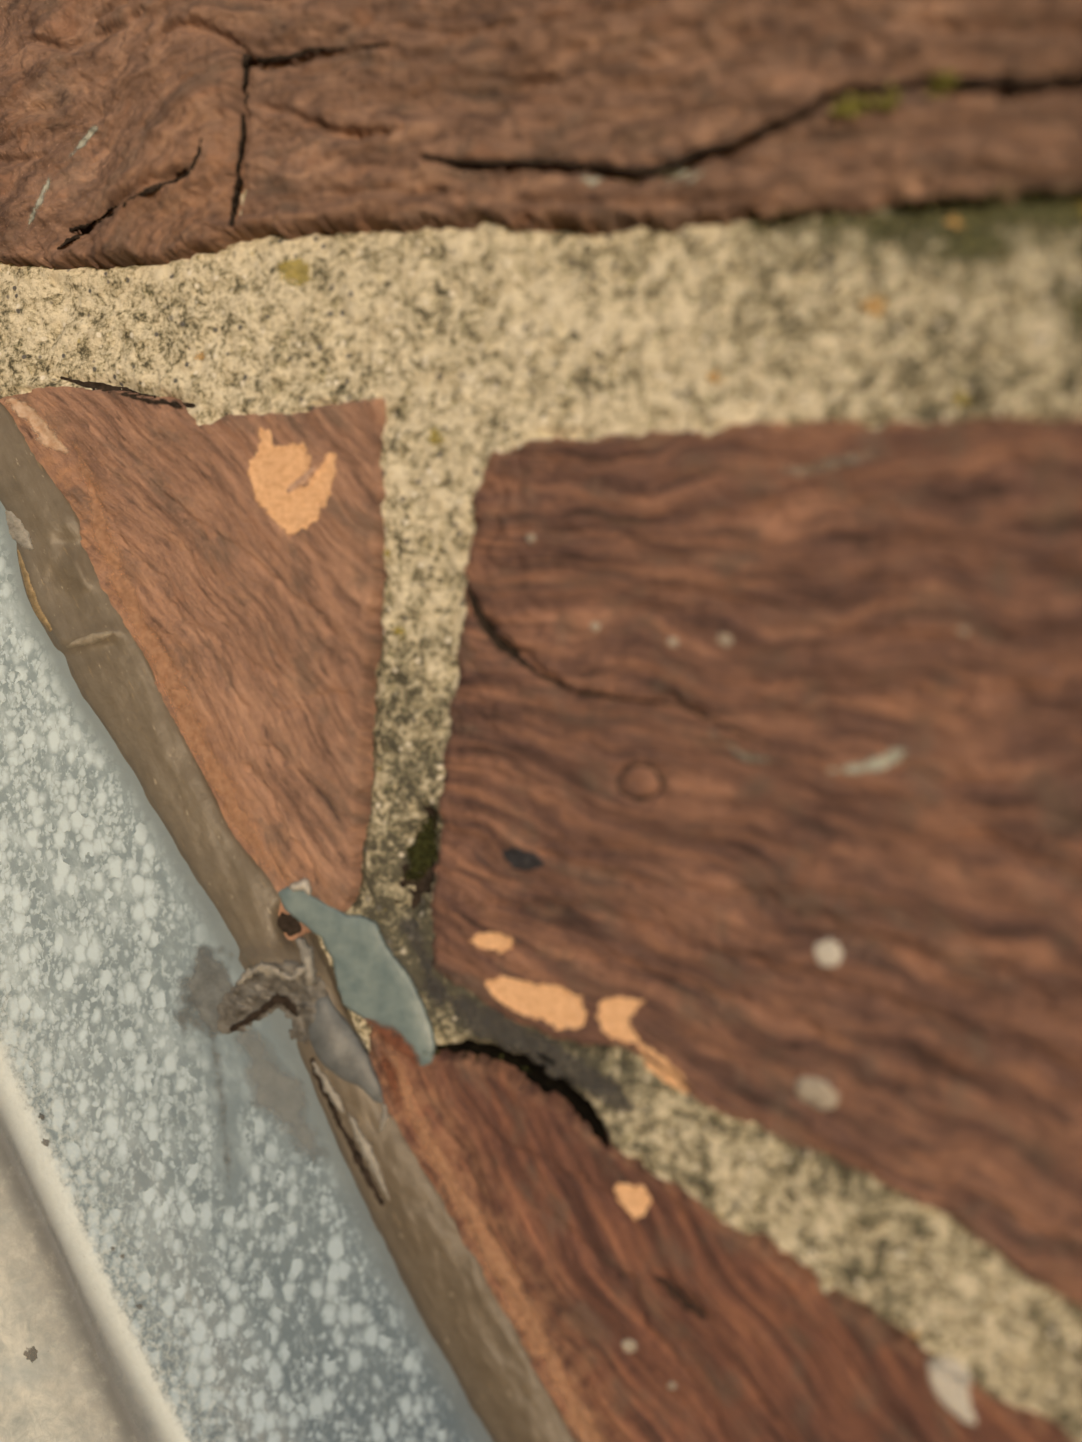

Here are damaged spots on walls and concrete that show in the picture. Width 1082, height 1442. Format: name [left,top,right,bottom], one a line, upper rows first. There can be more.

crack [229,43,398,226]
crack [421,73,1082,176]
crack [57,138,202,249]
spalling [247,426,337,535]
spalling [469,932,514,954]
spalling [484,975,692,1095]
crack [436,1039,610,1148]